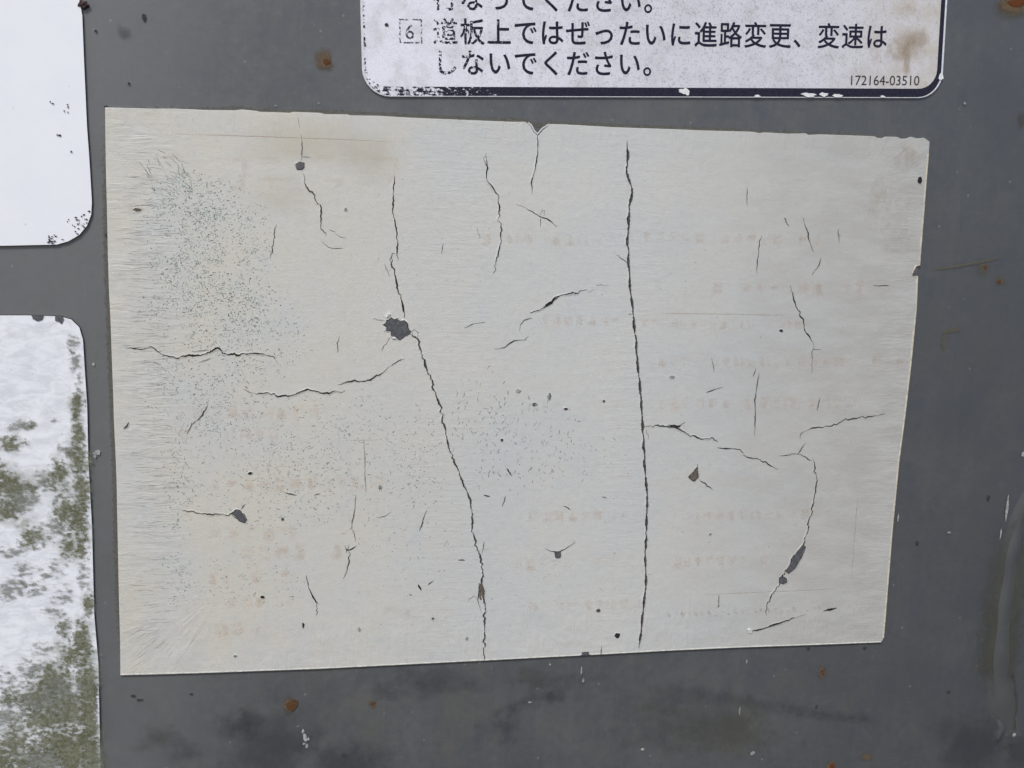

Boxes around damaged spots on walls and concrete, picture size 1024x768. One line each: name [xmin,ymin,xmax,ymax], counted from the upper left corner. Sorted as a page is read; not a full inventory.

crack [117,120,885,667]